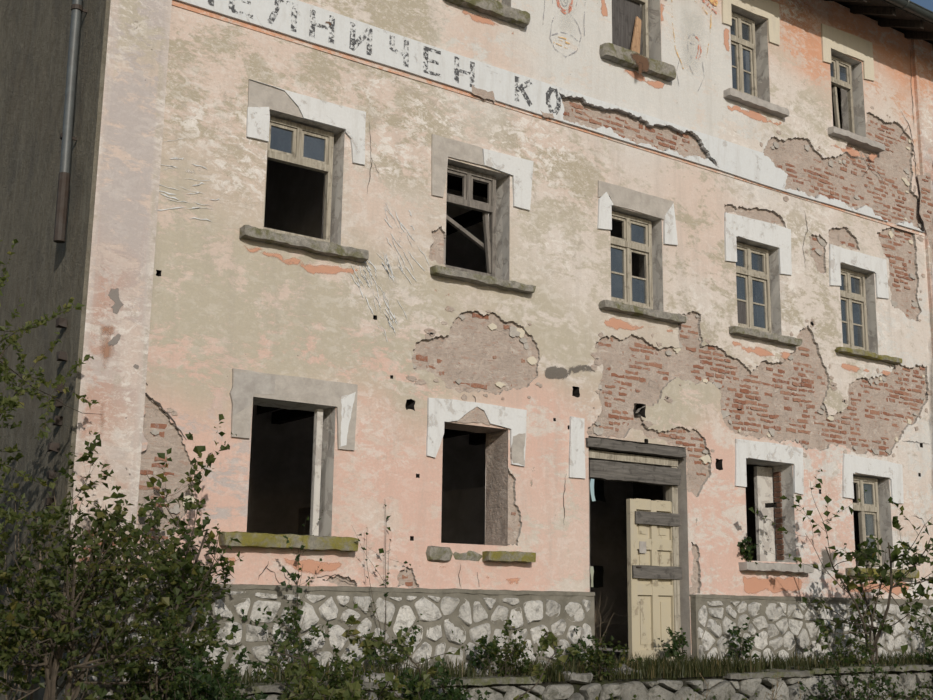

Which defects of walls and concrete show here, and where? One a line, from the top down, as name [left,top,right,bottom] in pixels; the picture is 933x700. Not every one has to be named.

flaking render [540,95,713,163]
peeling [108,289,124,314]
peeling [247,204,446,342]
flaking render [406,306,542,400]
flaking render [587,311,933,497]
flaking render [724,106,933,322]
flaking render [74,392,196,580]
flaking render [508,433,526,546]